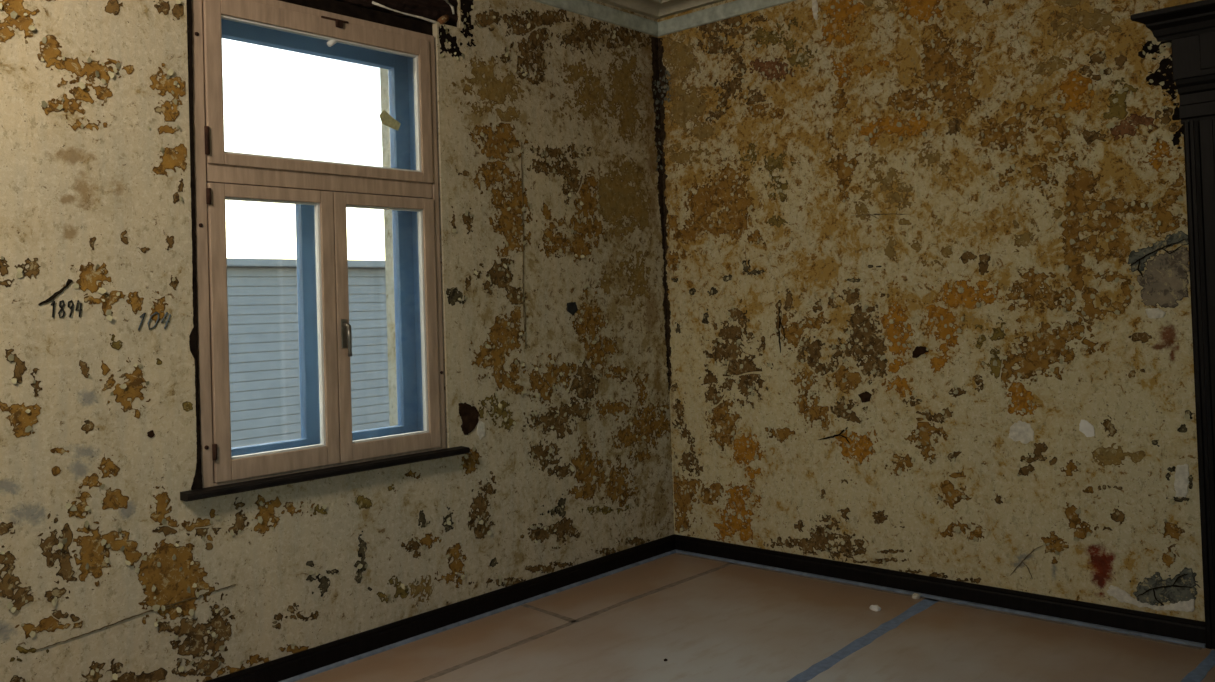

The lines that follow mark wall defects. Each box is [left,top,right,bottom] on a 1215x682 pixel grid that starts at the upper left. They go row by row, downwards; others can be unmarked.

peeling [0,0,134,133]
peeling [0,256,41,288]
spalling [63,0,203,490]
crack [651,37,672,391]
peeling [354,0,1194,606]
peeling [0,349,43,438]
peeling [50,448,69,476]
peeling [0,453,327,682]
peeling [272,561,340,629]
spalling [1130,519,1200,609]